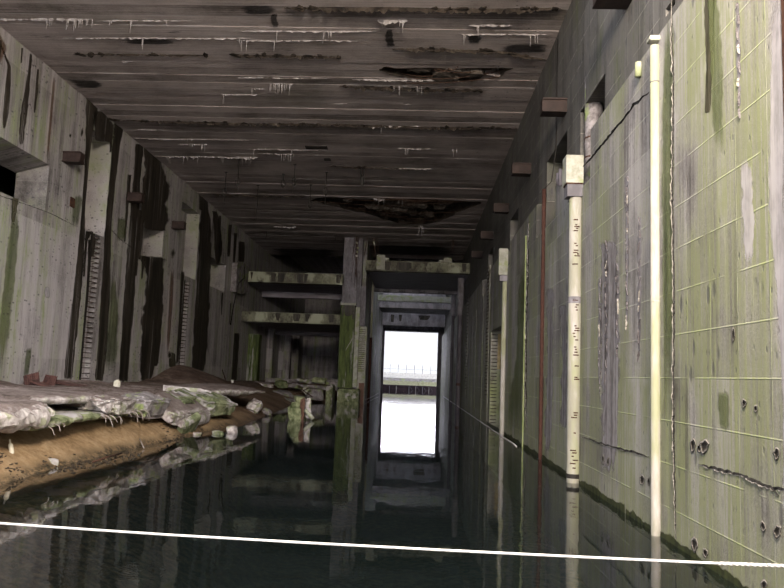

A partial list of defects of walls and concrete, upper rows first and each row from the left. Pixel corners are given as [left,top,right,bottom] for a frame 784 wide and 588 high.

damp [70,80,101,88]
spalling [339,66,513,93]
crack [583,92,649,167]
spalling [311,197,481,225]
damp [64,99,326,382]
crack [669,0,677,539]
peeling [598,176,642,471]
crack [581,437,649,457]
crack [698,464,784,496]